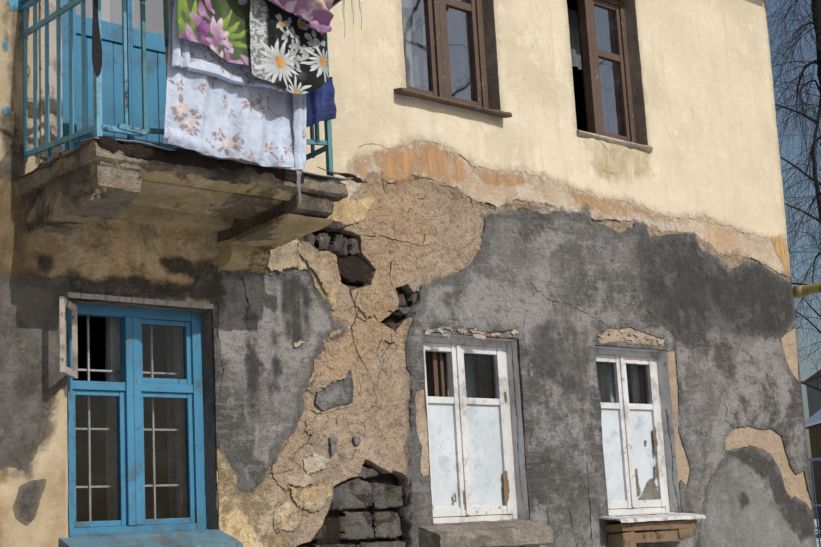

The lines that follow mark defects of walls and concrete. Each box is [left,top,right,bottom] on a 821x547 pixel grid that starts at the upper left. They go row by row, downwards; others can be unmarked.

water stain [0,115,17,153]
water stain [0,173,53,277]
spalling [0,136,790,547]
peeling [781,328,799,381]
crack [286,290,413,547]
crack [510,318,537,501]
peeling [725,426,812,509]